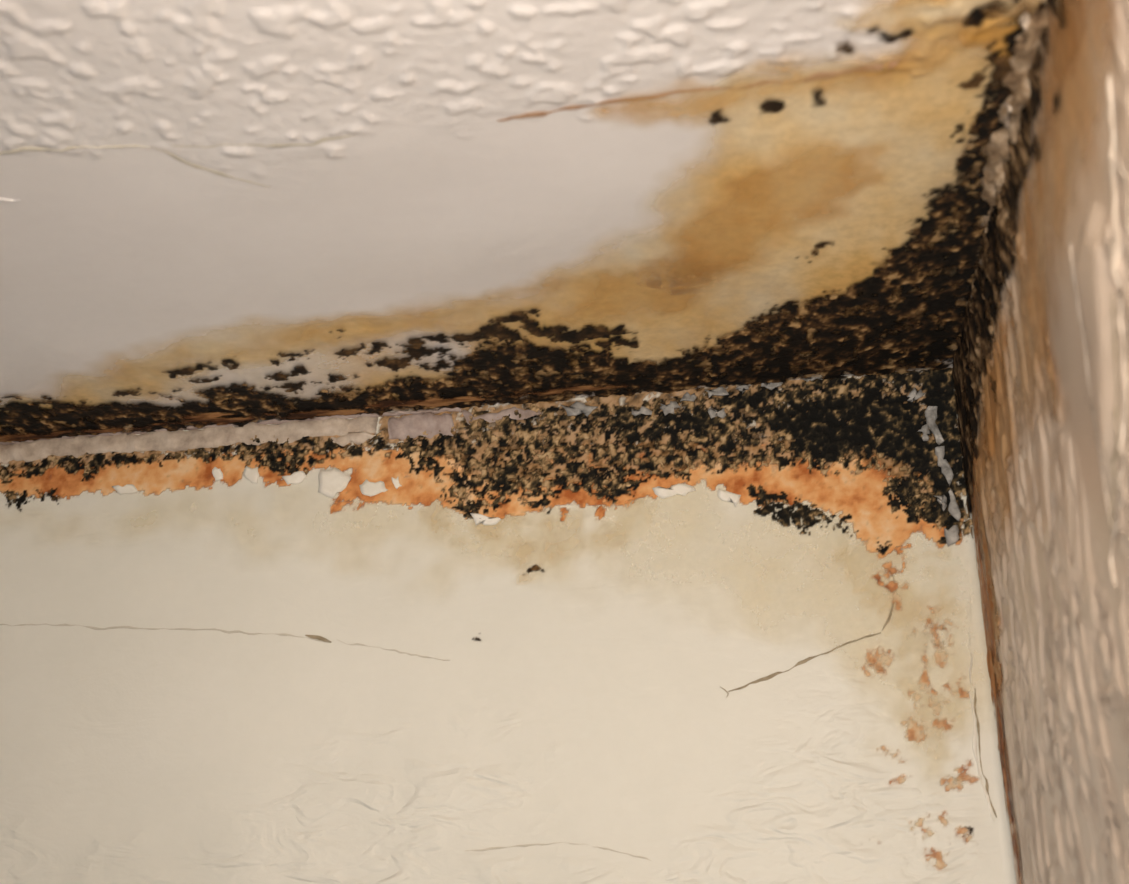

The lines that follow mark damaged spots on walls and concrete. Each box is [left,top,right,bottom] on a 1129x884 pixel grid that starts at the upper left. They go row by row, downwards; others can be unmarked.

crack [0,135,354,187]
crack [0,196,21,204]
water stain [0,0,1107,544]
flaking render [632,382,783,419]
peeling [0,388,965,572]
crack [0,624,450,661]
crack [720,574,895,698]